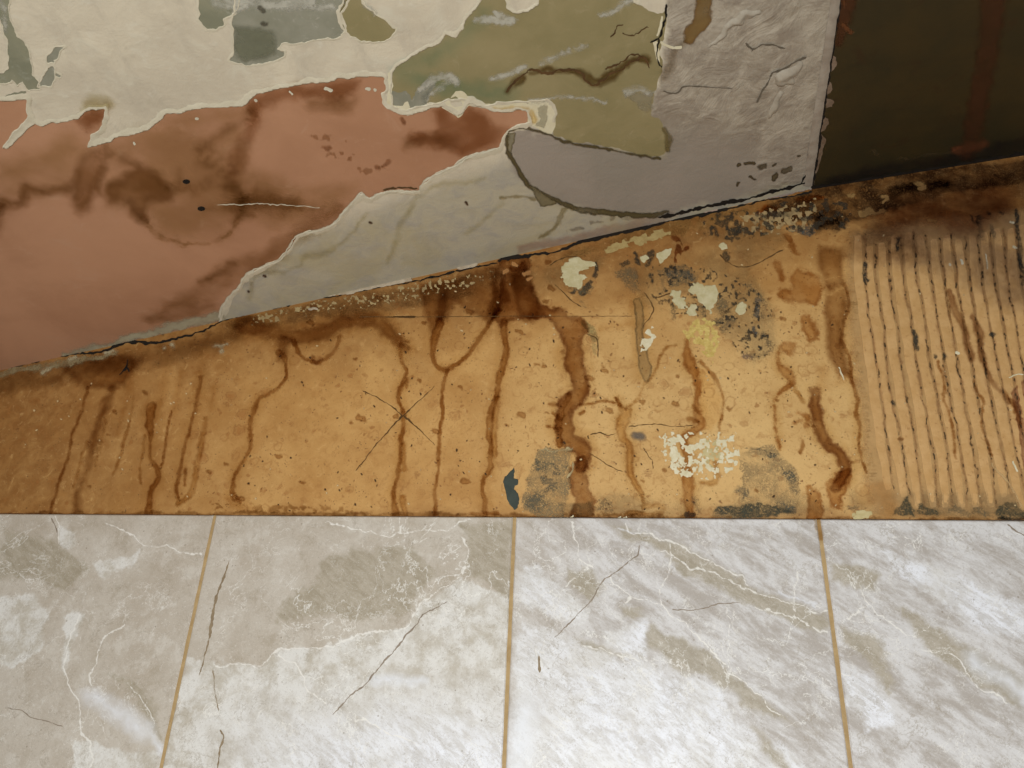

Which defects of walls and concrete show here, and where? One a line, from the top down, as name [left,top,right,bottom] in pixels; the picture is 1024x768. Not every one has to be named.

peeling [0,0,672,370]
crack [324,0,1024,356]
damp [736,155,800,187]
crack [16,317,237,375]
damp [571,262,598,296]
damp [616,250,772,360]
damp [703,199,852,262]
damp [1014,209,1024,285]
crack [356,388,434,470]
peeling [503,447,573,518]
crack [538,545,640,673]
crack [333,602,446,714]